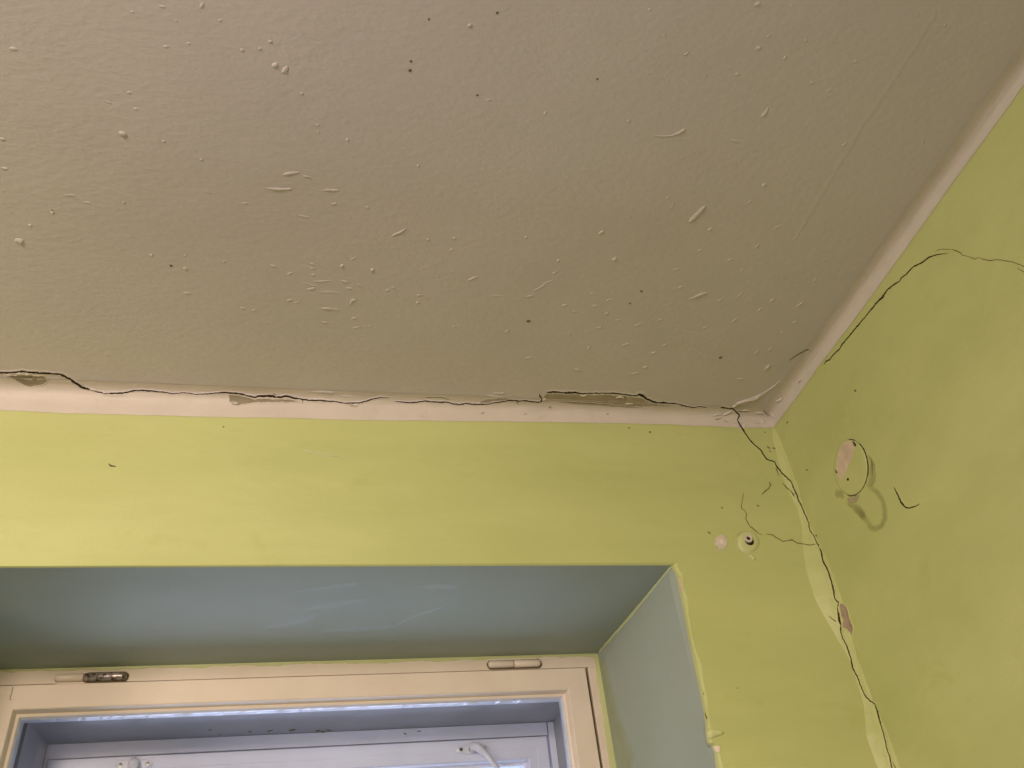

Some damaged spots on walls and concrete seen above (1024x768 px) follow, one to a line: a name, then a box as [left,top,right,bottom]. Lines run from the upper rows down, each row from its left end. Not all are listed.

crack [789,249,1024,384]
spalling [543,393,673,407]
peeling [835,441,856,481]
crack [0,368,896,768]